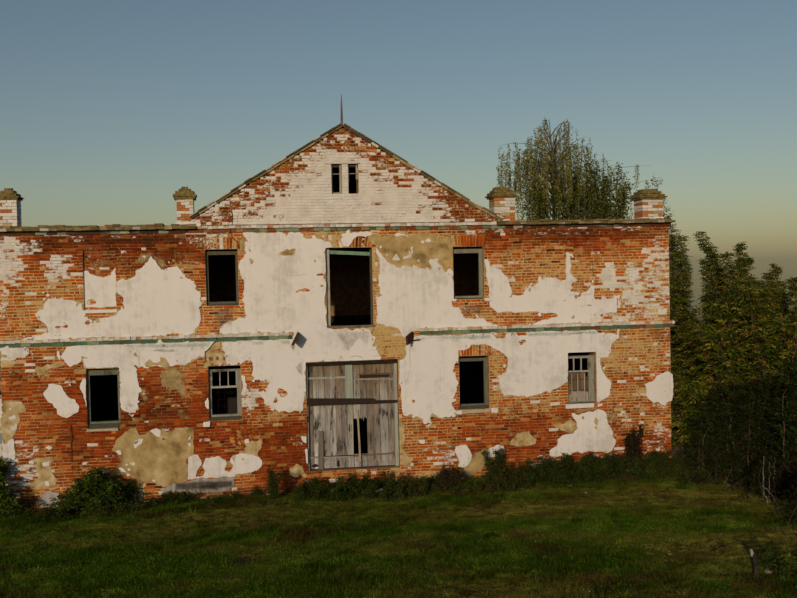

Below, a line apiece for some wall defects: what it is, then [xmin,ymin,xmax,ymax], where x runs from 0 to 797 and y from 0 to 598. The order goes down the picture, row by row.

spalling [0,129,673,512]